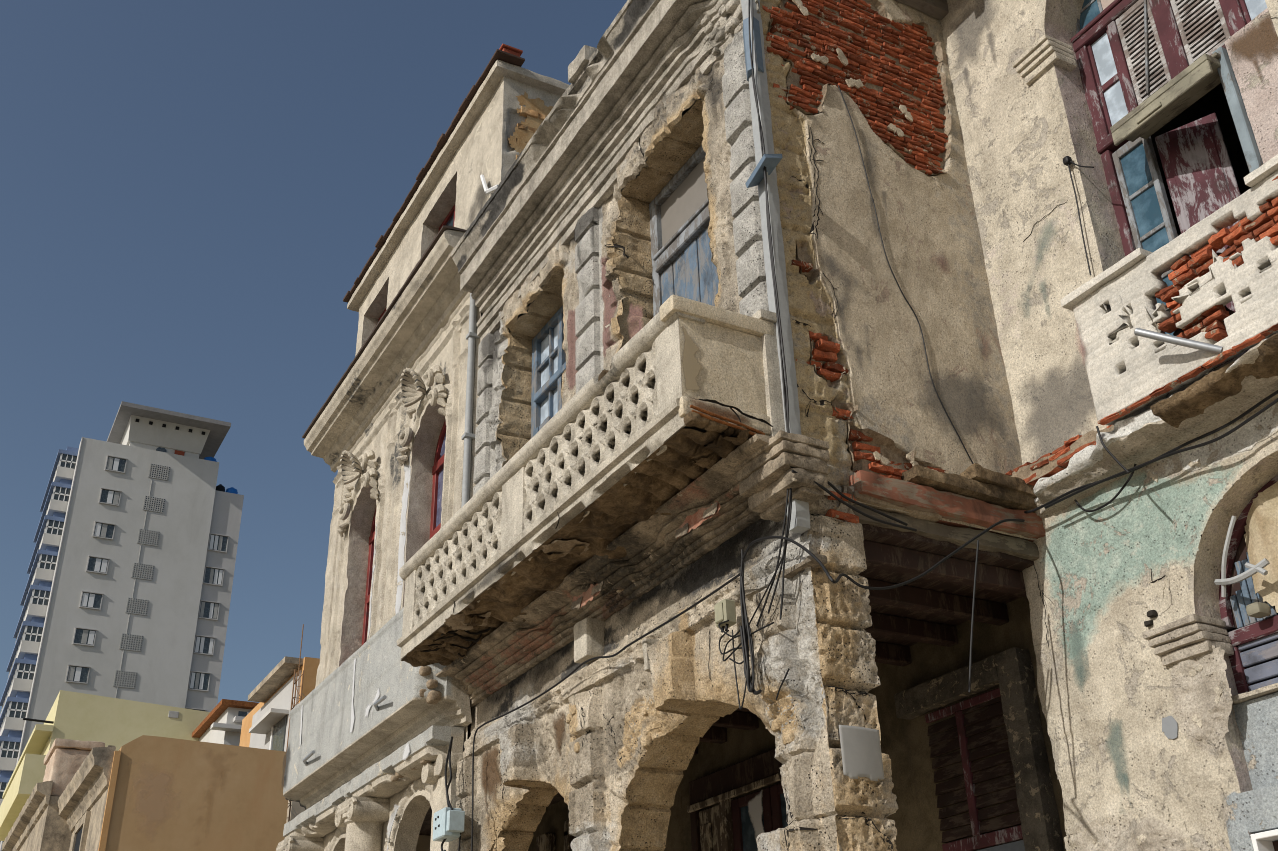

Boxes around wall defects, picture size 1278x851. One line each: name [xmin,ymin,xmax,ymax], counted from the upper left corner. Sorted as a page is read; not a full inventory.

spalling [508,91,553,159]
spalling [762,0,951,188]
spalling [791,239,820,282]
spalling [1155,196,1278,342]
spalling [796,331,949,524]
spalling [1005,425,1114,486]
spalling [540,539,590,561]
peeling [570,581,603,610]
crack [1034,567,1051,647]
spalling [406,612,491,704]